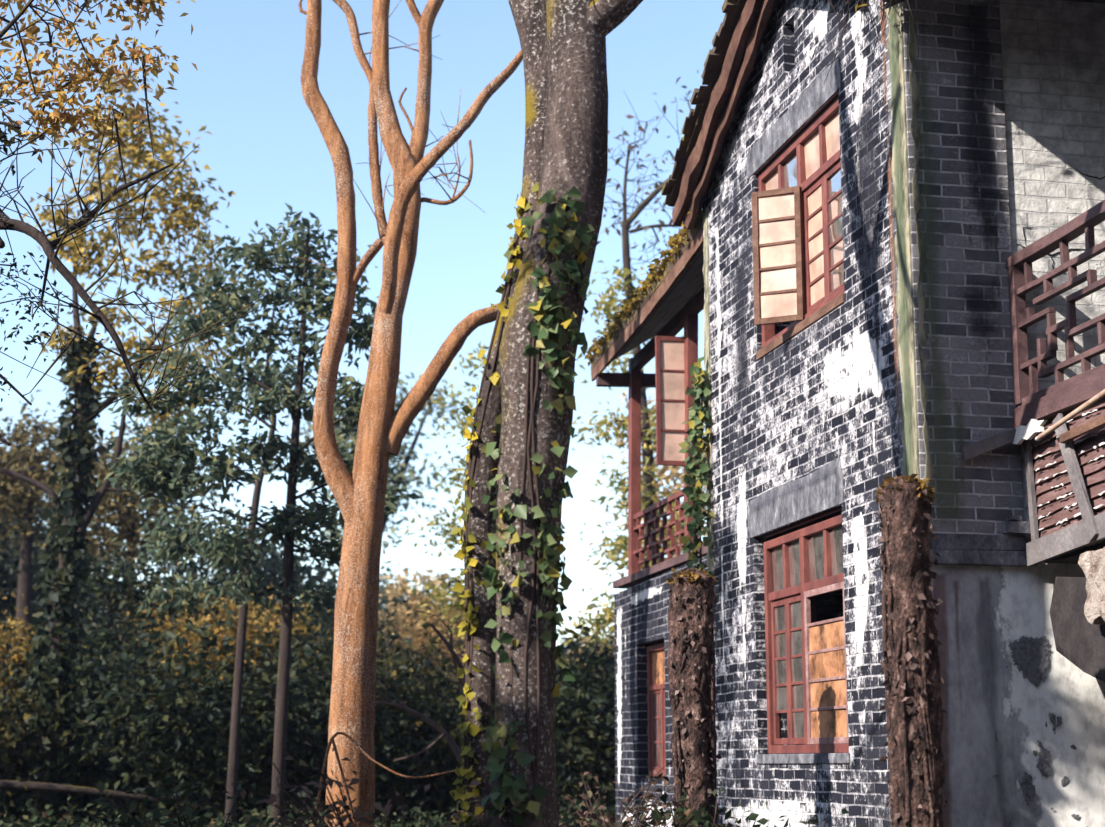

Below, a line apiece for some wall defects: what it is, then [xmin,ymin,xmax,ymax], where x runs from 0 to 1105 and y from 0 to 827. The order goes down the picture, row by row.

damp [856,113,880,279]
damp [736,260,748,392]
damp [966,283,995,336]
peeling [1034,426,1081,530]
peeling [994,563,1105,827]